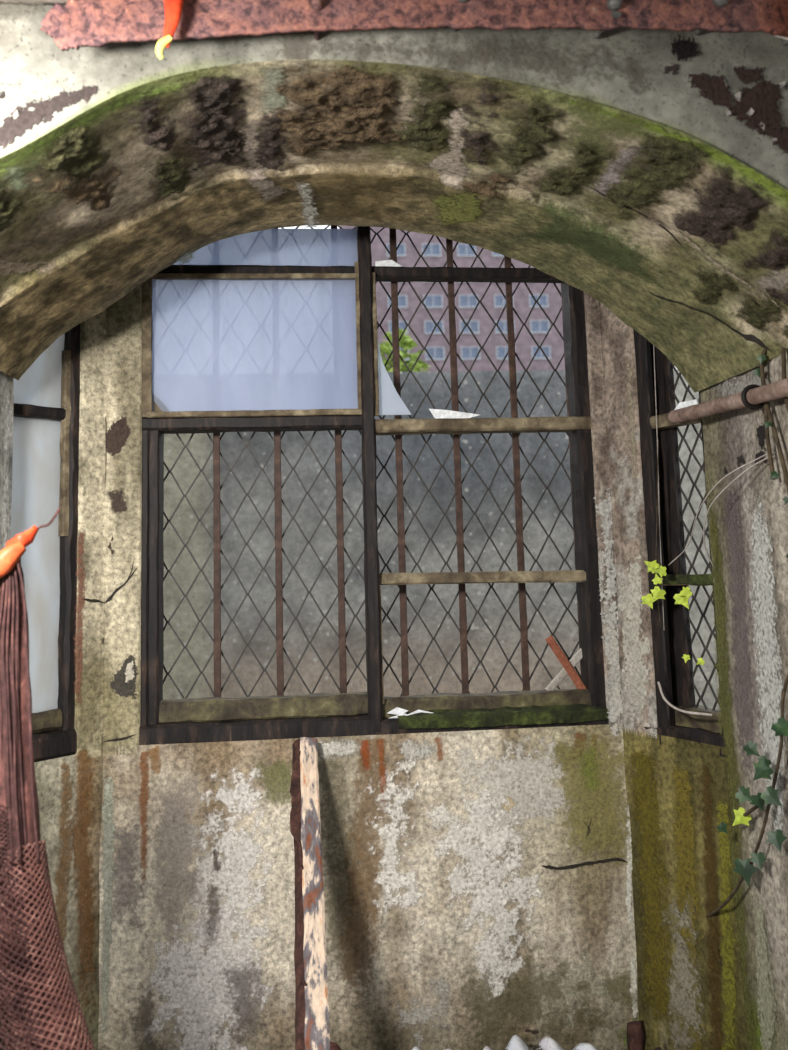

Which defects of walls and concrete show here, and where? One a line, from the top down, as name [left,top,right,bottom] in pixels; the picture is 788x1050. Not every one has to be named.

peeling [0,85,98,149]
water stain [238,32,331,201]
water stain [424,108,472,189]
spalling [128,65,775,254]
peeling [661,34,788,154]
peeling [105,415,130,457]
crack [83,561,137,603]
rust [55,750,95,1004]
rust [139,746,160,878]
rust [290,751,304,870]
rust [341,739,386,997]
water stain [631,483,785,1050]